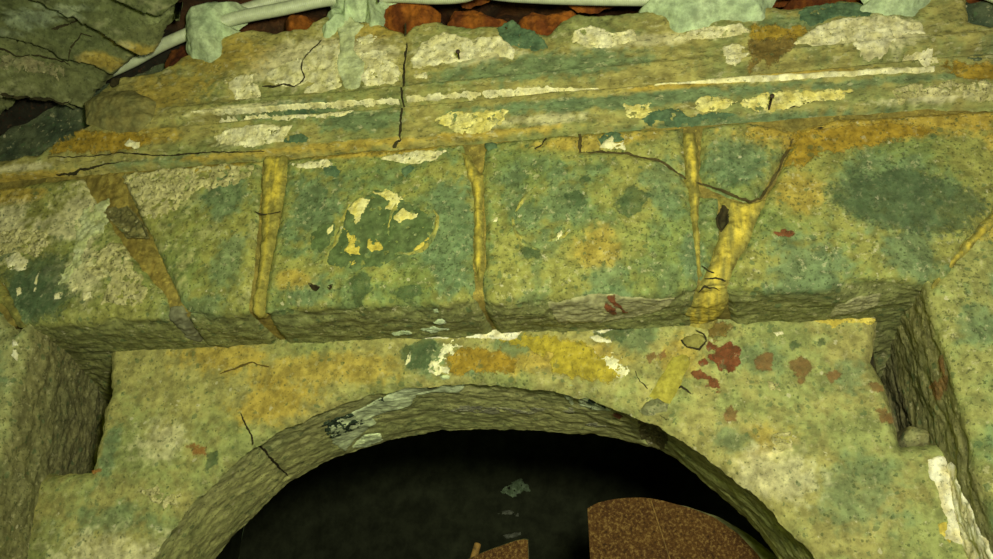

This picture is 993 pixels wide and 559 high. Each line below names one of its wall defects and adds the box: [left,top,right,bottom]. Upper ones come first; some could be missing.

crack [262,40,322,88]
peeling [190,43,599,151]
crack [392,23,408,148]
peeling [411,20,548,79]
peeling [623,2,939,128]
crack [52,150,264,176]
crack [578,134,794,203]
leakage [830,168,988,239]
peeling [310,189,433,307]
corrosion [604,294,628,315]
corrosion [691,321,742,393]
corrosion [790,356,812,384]